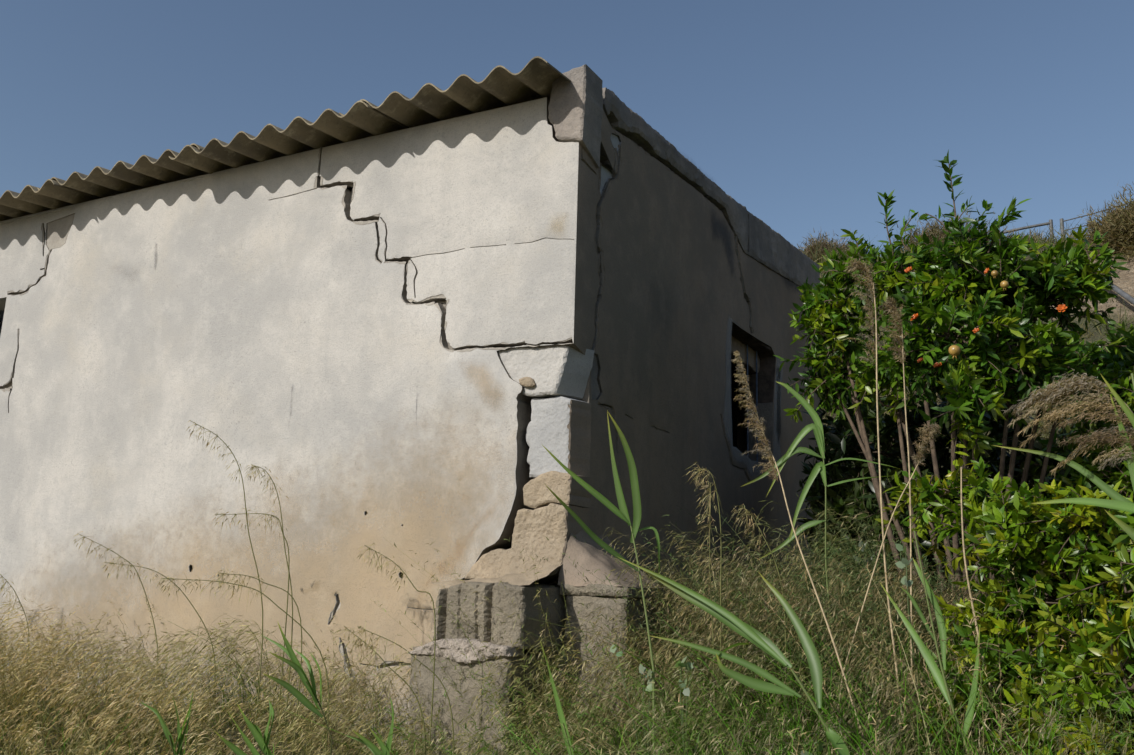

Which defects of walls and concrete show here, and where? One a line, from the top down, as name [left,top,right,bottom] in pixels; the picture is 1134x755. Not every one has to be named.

crack [7,223,52,296]
crack [270,109,754,353]
crack [0,329,19,413]